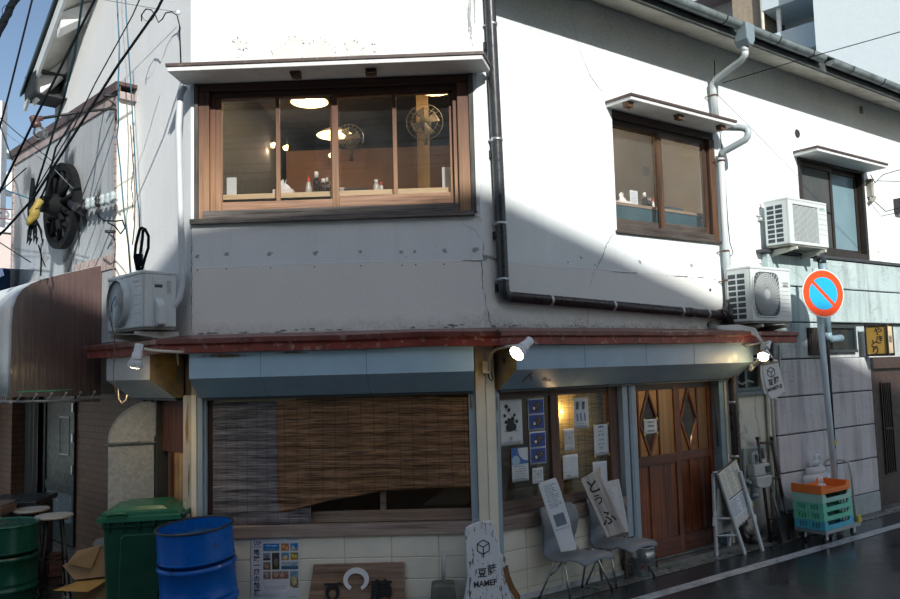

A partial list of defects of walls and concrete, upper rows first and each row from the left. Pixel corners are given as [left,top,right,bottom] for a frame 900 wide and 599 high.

peeling [263,28,376,59]
crack [468,226,492,327]